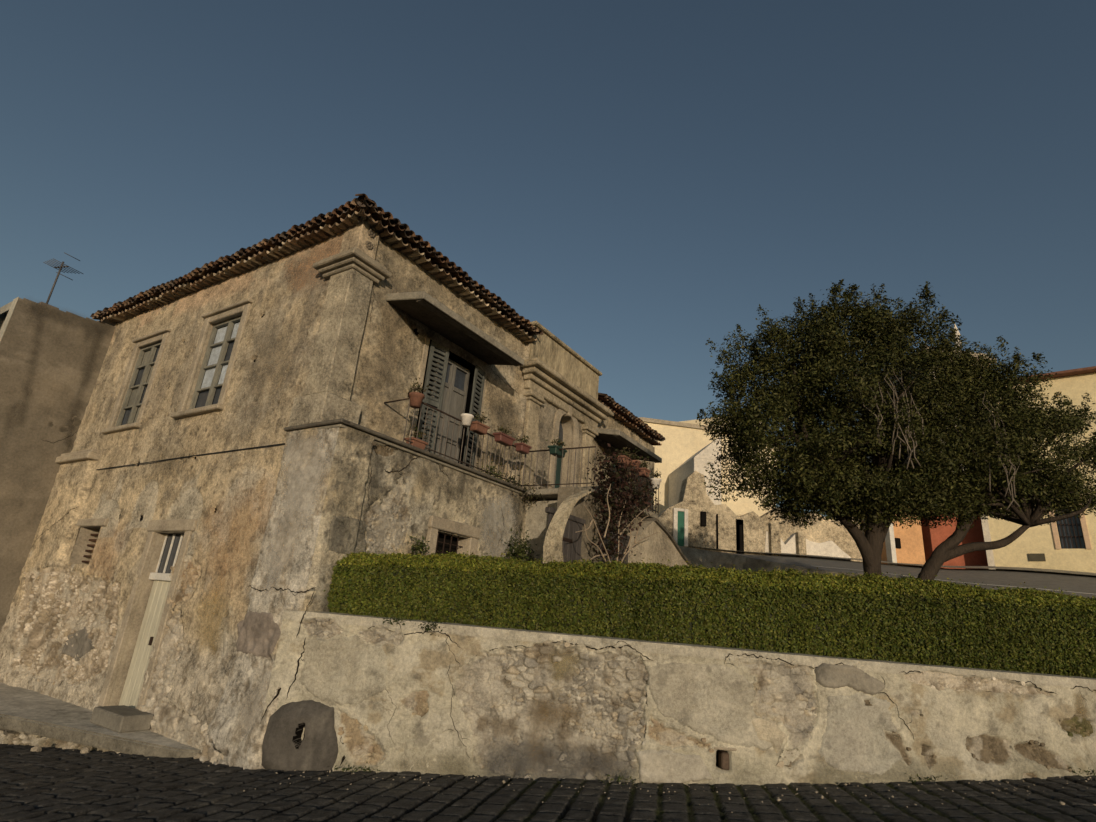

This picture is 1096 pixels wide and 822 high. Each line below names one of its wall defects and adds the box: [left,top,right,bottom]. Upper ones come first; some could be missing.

flaking render [6,565,121,688]
crack [248,585,316,721]
flaking render [336,709,387,769]
flaking render [453,641,715,782]
flaking render [721,654,818,769]
flaking render [965,733,1074,780]